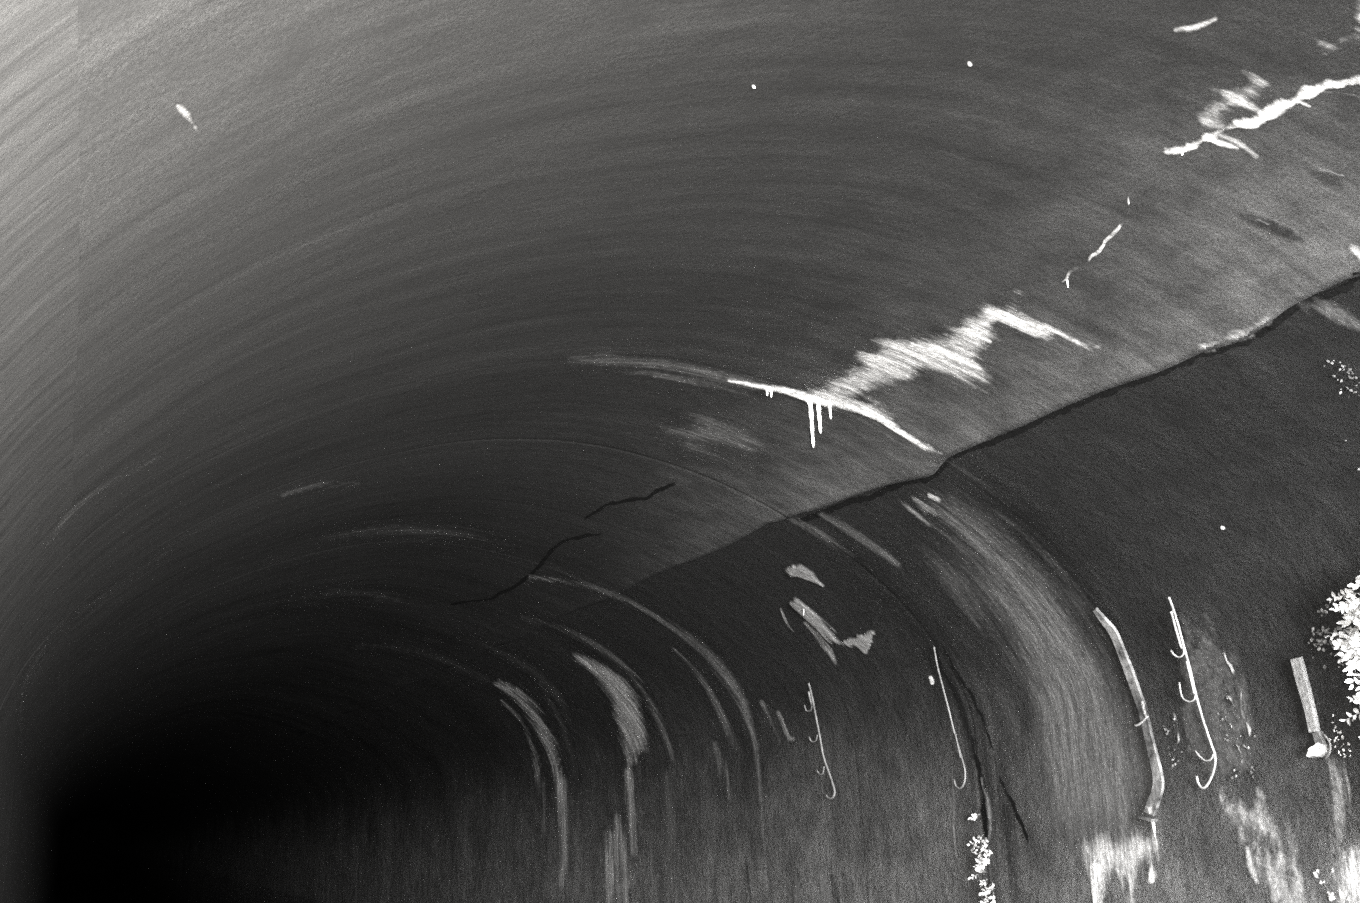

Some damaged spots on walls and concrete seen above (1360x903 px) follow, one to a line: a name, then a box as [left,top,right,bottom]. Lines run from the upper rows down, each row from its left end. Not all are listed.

damp [1173,83,1342,156]
damp [672,309,1078,450]
crack [798,272,1360,522]
damp [908,494,1158,903]
damp [1247,849,1360,901]